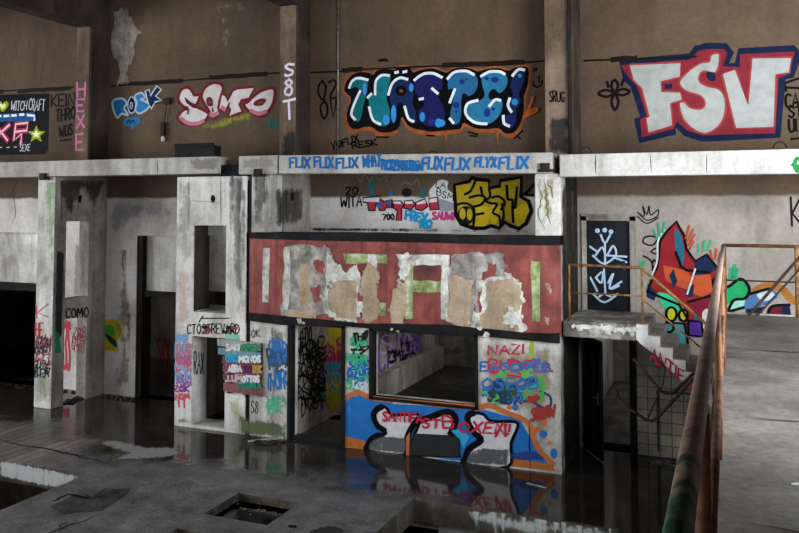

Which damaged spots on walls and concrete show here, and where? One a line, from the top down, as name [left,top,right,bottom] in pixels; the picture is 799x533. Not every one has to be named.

spalling [111,8,142,87]
peeling [280,244,411,332]
peeling [445,252,528,338]
crack [48,514,98,533]
damp [472,511,611,533]